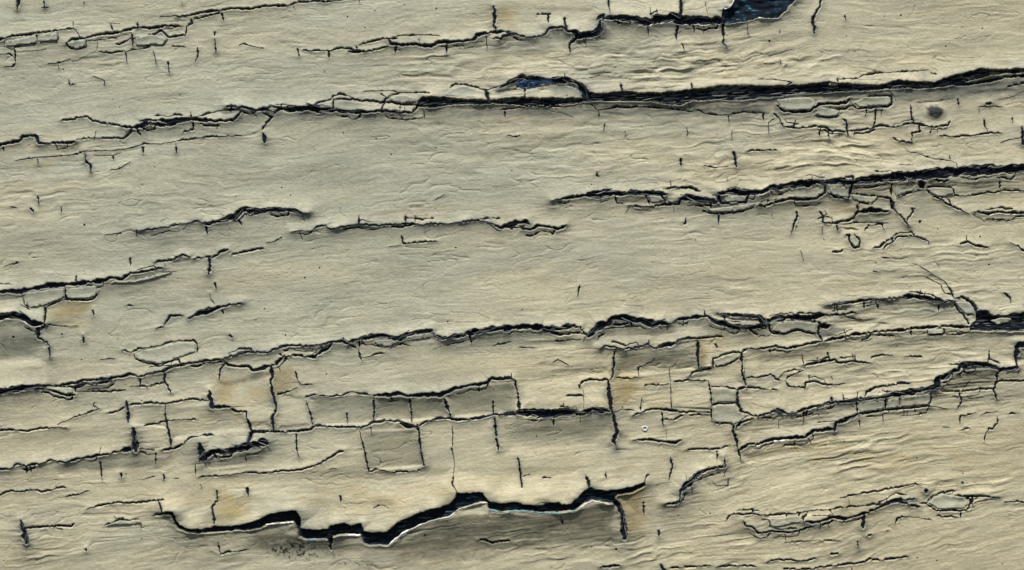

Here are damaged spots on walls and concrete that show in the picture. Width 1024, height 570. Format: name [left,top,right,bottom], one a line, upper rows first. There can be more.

crack [0,0,360,69]
crack [297,0,749,57]
peeling [722,0,795,24]
crack [811,0,822,33]
crack [0,69,1024,253]
crack [0,207,1024,556]
crack [660,483,1024,570]